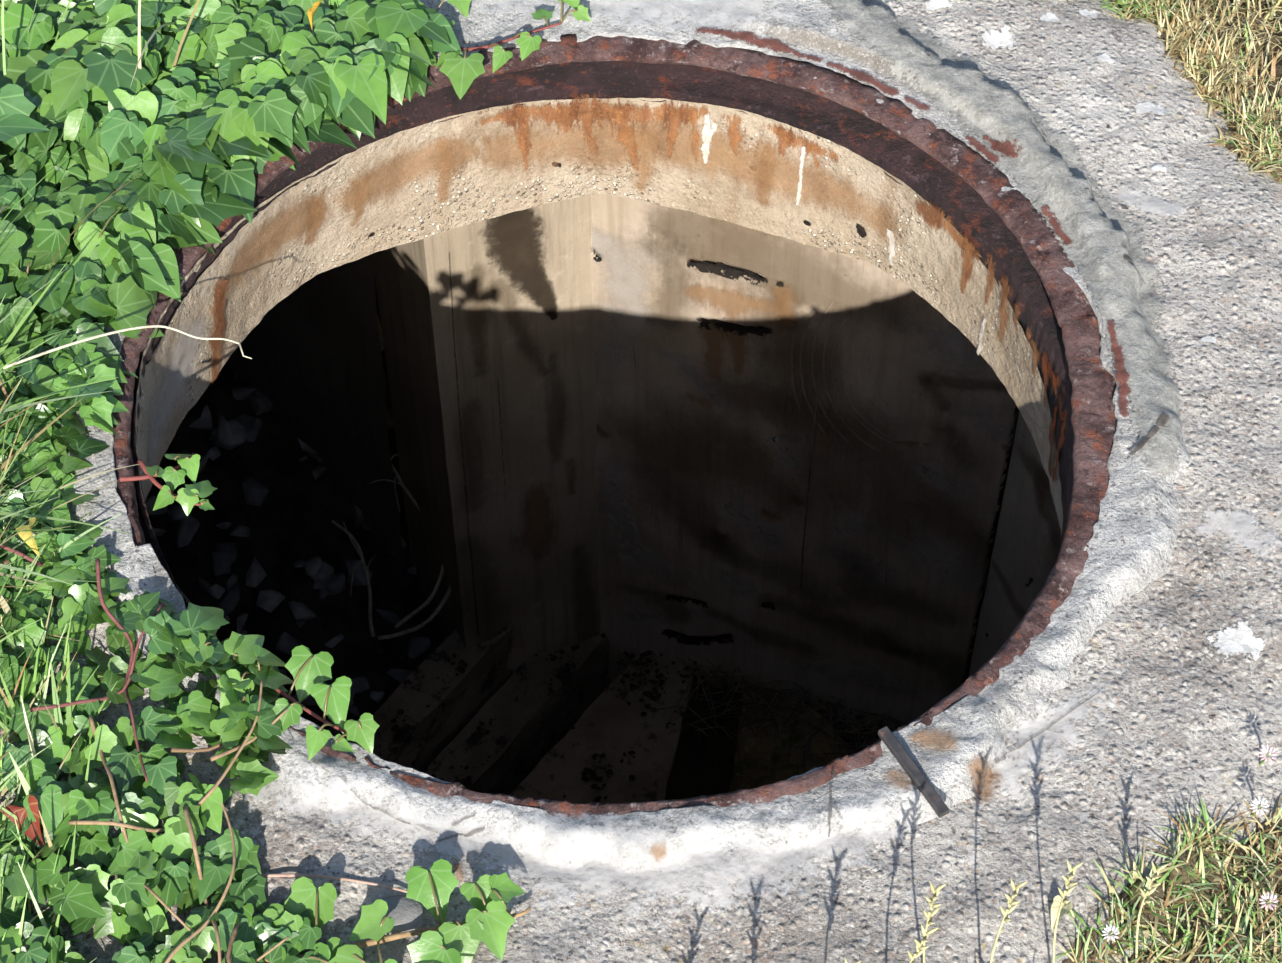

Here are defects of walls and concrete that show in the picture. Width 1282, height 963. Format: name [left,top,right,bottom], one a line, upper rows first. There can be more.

corrosion [696,27,931,111]
corrosion [344,96,889,233]
corrosion [966,135,1022,164]
corrosion [210,198,326,383]
water stain [485,208,558,320]
water stain [592,234,646,363]
water stain [887,229,896,266]
water stain [977,317,986,355]
corrosion [916,200,1066,481]
corrosion [1042,205,1072,245]
corrosion [1107,320,1131,417]
corrosion [971,761,993,799]